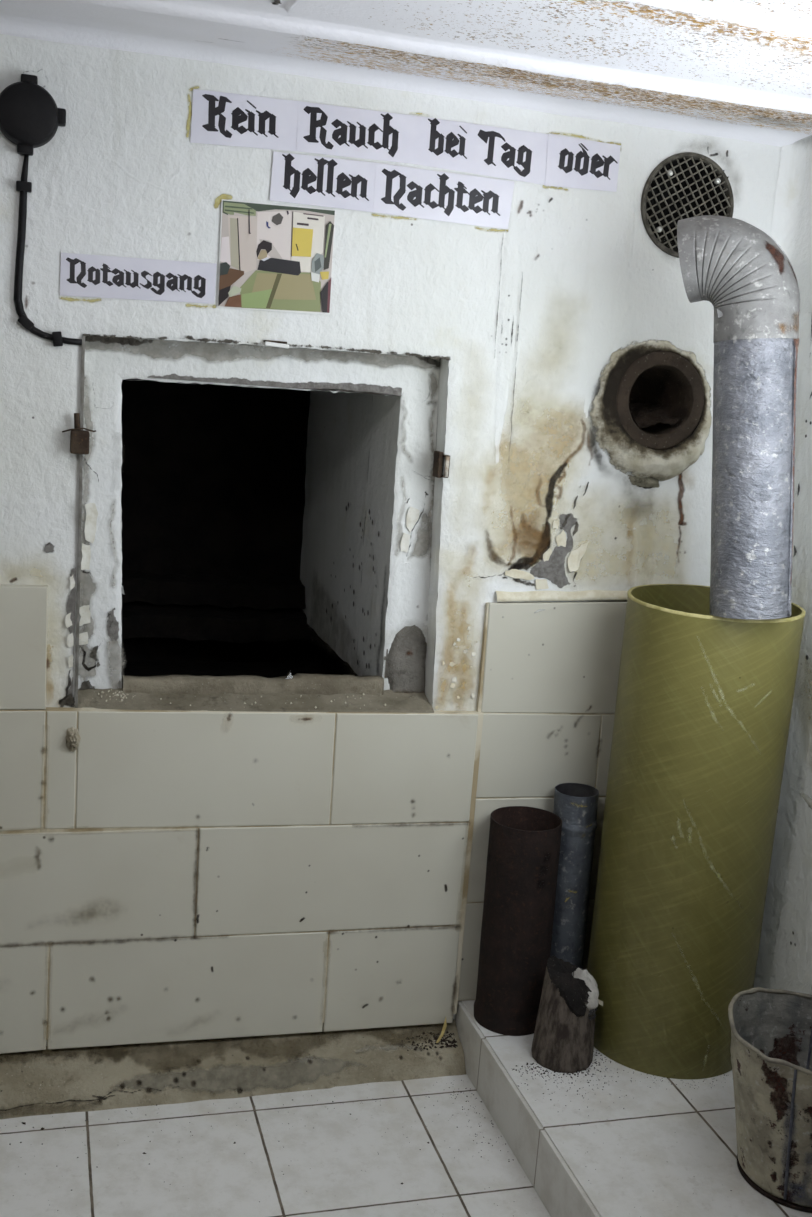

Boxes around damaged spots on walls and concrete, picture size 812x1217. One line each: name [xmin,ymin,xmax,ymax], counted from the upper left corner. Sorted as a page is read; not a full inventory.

corrosion [305,38,812,122]
corrosion [593,0,812,52]
spalling [59,377,123,707]
crack [479,463,589,578]
spalling [503,513,588,590]
damp [510,386,602,559]